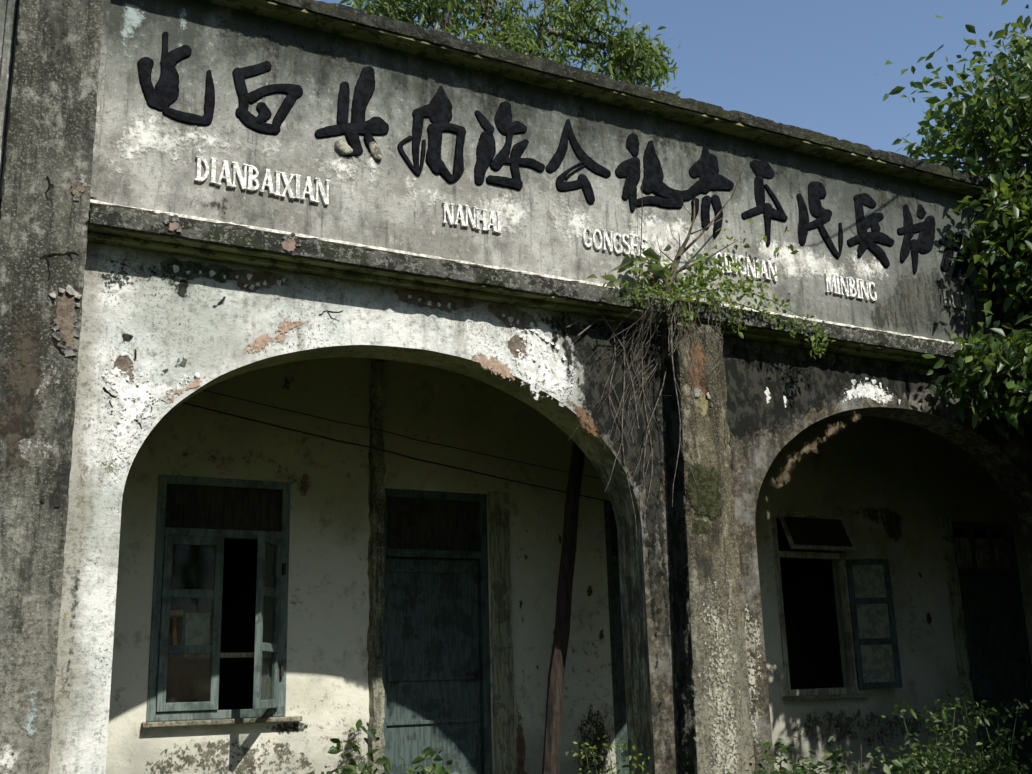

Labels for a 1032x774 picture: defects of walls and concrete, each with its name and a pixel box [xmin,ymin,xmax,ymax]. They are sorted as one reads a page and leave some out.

water stain [0,299,50,479]
flaking render [49,285,83,359]
flaking render [101,333,212,480]
peeling [160,257,288,293]
peeling [245,318,307,356]
peeling [393,289,475,313]
flaking render [472,303,576,407]
water stain [723,340,946,471]
water stain [538,311,763,774]
water stain [146,722,315,774]
water stain [792,708,944,746]